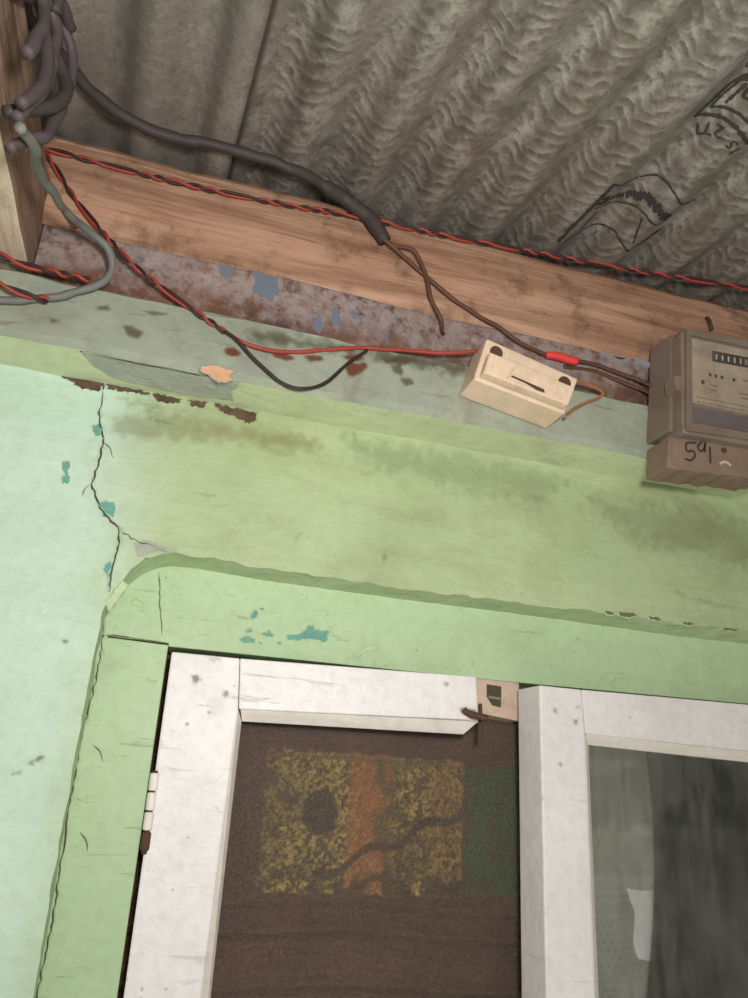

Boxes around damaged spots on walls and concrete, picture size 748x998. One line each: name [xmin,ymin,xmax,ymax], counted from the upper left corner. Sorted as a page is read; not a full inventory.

peeling [58,351,260,425]
rust [32,224,650,406]
crack [82,386,152,592]
peeling [239,608,330,645]
crack [36,572,169,998]